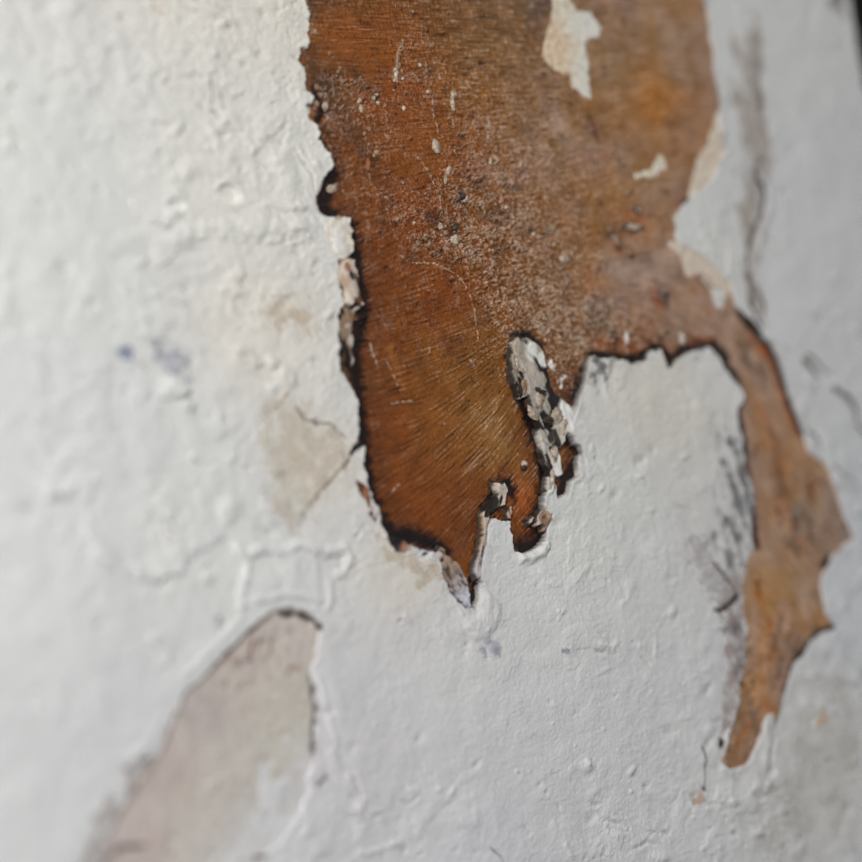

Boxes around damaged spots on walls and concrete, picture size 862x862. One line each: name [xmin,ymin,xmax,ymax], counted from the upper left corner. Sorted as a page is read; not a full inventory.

crack [746,154,766,326]
spalling [298,0,853,769]
peeling [102,607,327,862]